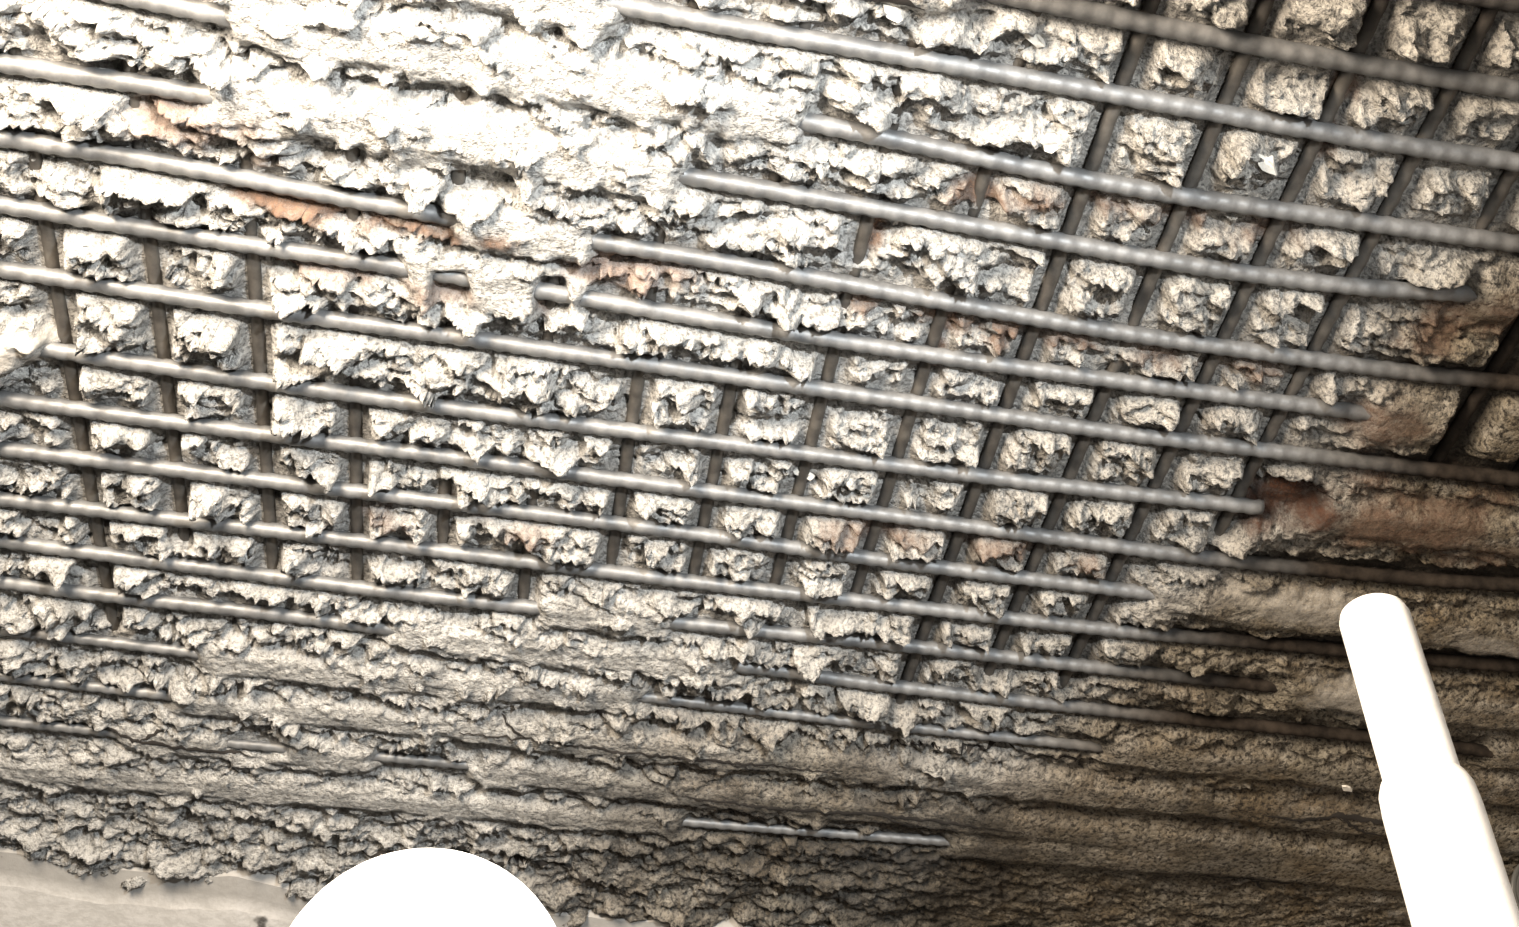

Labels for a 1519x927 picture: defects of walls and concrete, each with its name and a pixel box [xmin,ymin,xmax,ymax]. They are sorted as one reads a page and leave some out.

spalling [0,0,1519,578]
spalling [0,390,1519,927]
leakage [781,822,1021,925]